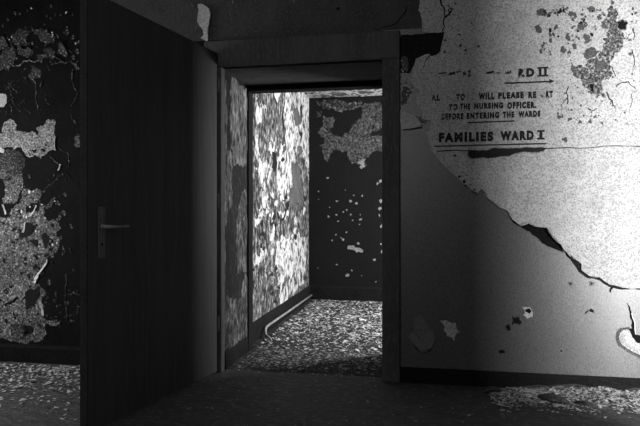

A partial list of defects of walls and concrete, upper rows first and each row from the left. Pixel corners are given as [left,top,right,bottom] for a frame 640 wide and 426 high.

peeling [191,4,211,41]
crack [440,0,453,32]
peeling [0,5,80,114]
flaking render [0,119,56,158]
flaking render [400,0,640,290]
crack [546,143,640,151]
flaking render [225,77,382,349]
flaking render [0,173,79,344]
flaking render [440,320,459,341]
spalling [506,307,533,331]